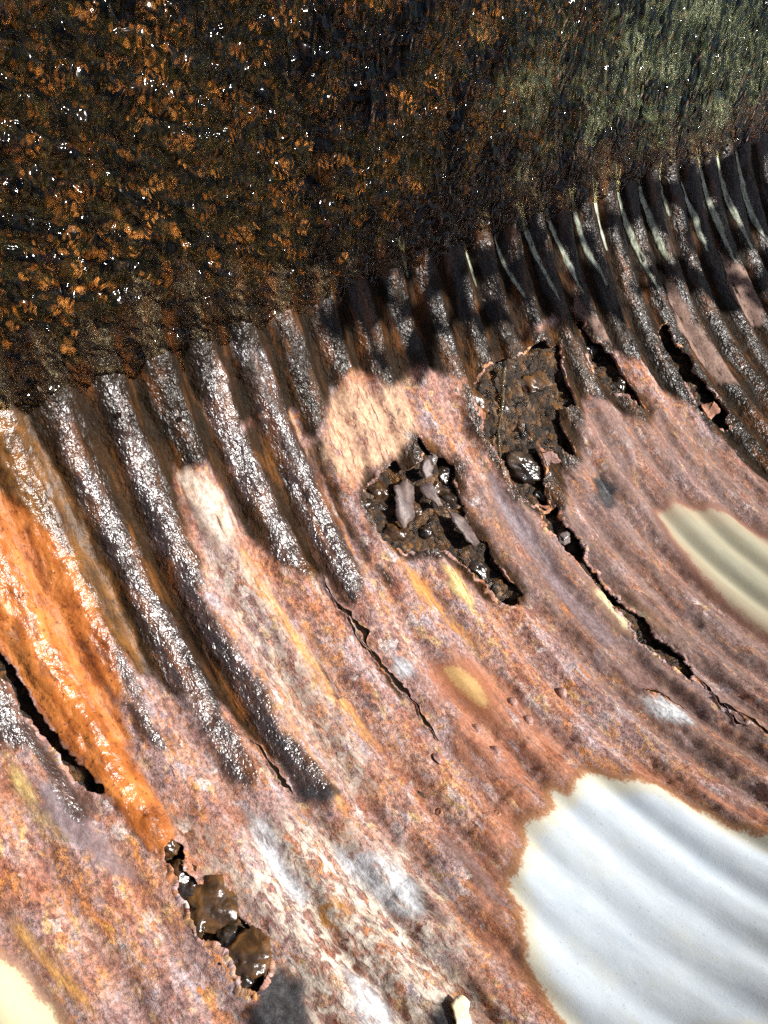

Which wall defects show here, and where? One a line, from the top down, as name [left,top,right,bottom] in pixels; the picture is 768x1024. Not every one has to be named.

corrosion [574,298,612,346]
corrosion [666,284,737,384]
corrosion [718,249,764,327]
peeling [542,450,561,468]
corrosion [179,471,234,546]
peeling [393,457,480,547]
crack [322,572,439,741]
crack [647,689,684,710]
crack [695,675,768,737]
corrosion [406,565,598,964]
corrosion [317,899,348,927]
corrosion [451,995,472,1024]